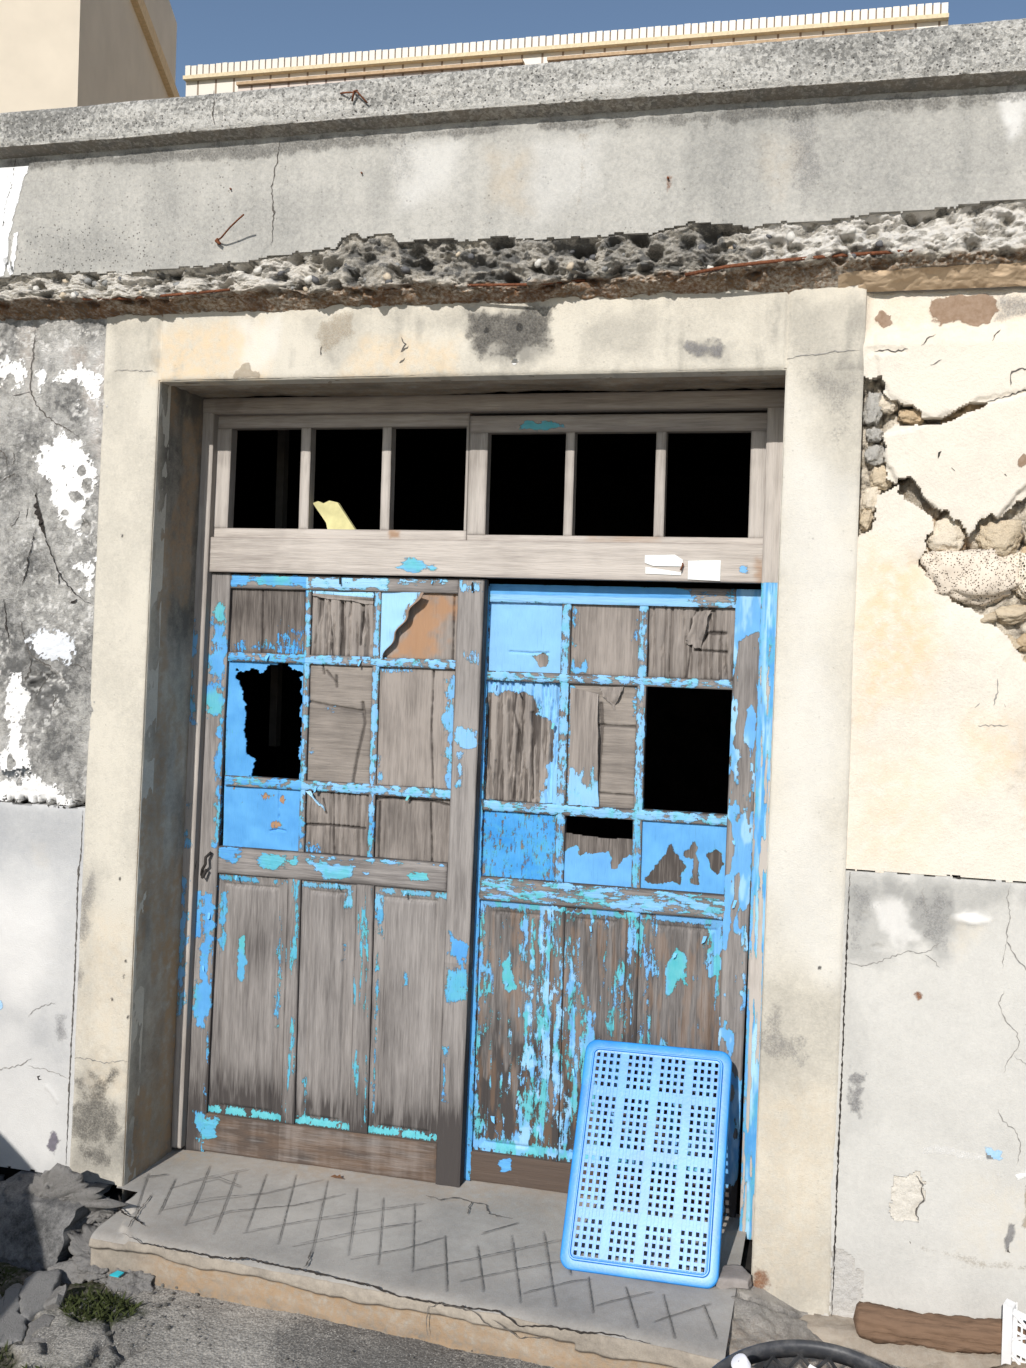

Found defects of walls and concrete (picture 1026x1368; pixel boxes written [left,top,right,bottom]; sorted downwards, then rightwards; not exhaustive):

crack [271,141,280,243]
spalling [0,200,1026,321]
peeling [0,353,104,406]
crack [0,450,91,707]
peeling [32,427,98,538]
flaking render [858,378,1026,662]
peeling [24,627,77,666]
peeling [0,672,81,806]
crack [851,942,940,967]
crack [998,885,1026,1071]
crack [0,1057,127,1078]
crack [118,1194,650,1344]